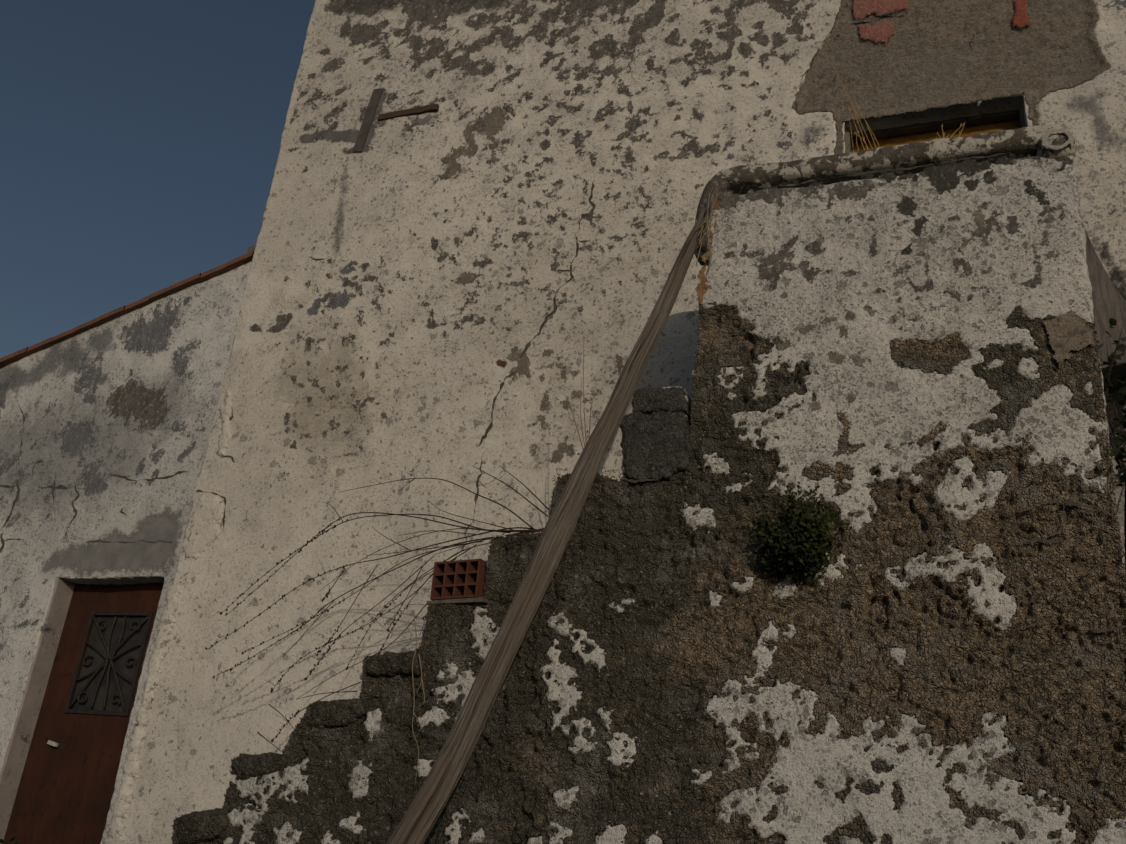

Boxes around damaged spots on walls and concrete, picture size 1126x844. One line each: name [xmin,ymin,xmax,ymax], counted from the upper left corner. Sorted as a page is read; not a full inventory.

spalling [289,0,1126,352]
crack [0,406,227,569]
peeling [250,240,421,470]
spalling [195,346,624,844]
crack [461,183,596,550]
spalling [424,155,1126,844]
spalling [171,813,187,844]